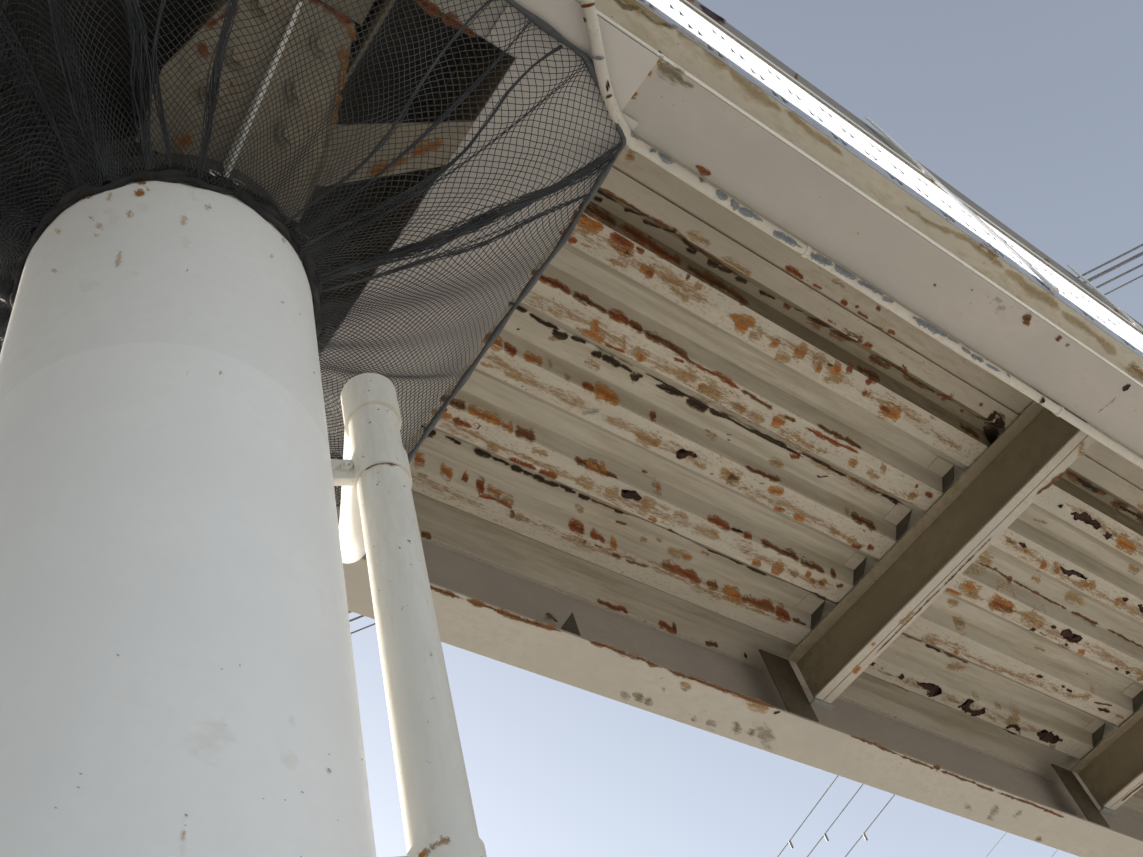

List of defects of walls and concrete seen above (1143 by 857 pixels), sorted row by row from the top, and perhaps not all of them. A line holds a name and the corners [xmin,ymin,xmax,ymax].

water stain [615,0,677,29]
water stain [659,63,692,87]
rust [559,188,996,449]
rust [480,265,933,551]
peeling [676,449,714,475]
rust [411,394,844,632]
peeling [1058,505,1113,540]
peeling [1037,559,1096,589]
rust [853,537,1143,697]
peeling [1029,625,1089,656]
rust [589,640,775,714]
peeling [1037,729,1063,744]